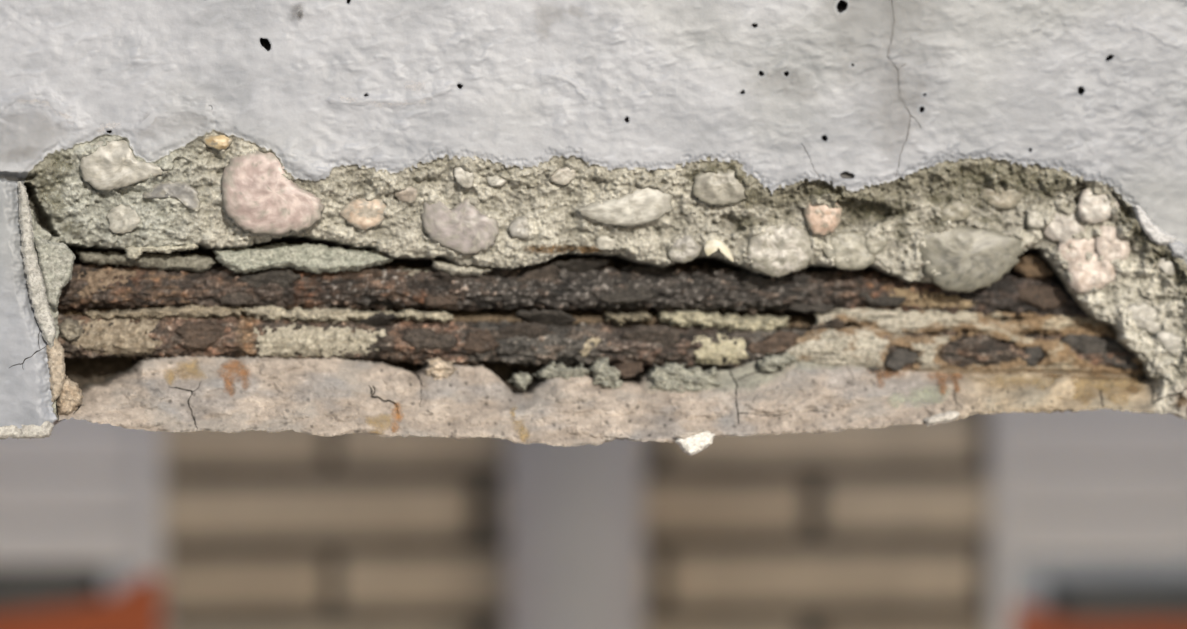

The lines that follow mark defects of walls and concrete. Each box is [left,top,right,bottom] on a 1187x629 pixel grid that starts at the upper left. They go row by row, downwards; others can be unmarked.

crack [887,0,921,178]
spalling [0,130,1187,455]
crack [170,382,201,429]
crack [369,362,422,413]